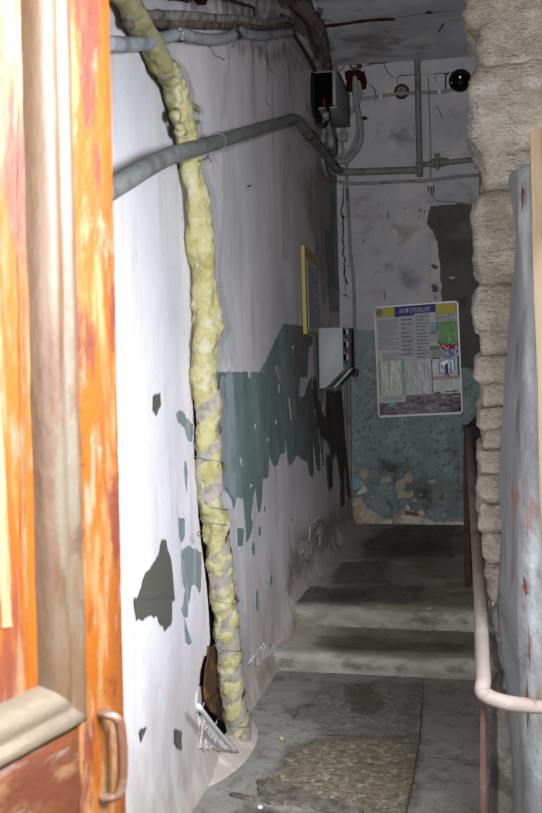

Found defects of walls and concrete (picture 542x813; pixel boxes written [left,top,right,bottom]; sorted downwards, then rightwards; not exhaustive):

peeling [277,0,345,71]
spalling [344,64,367,93]
crack [315,184,350,327]
peeling [216,324,329,561]
spalling [352,457,464,525]